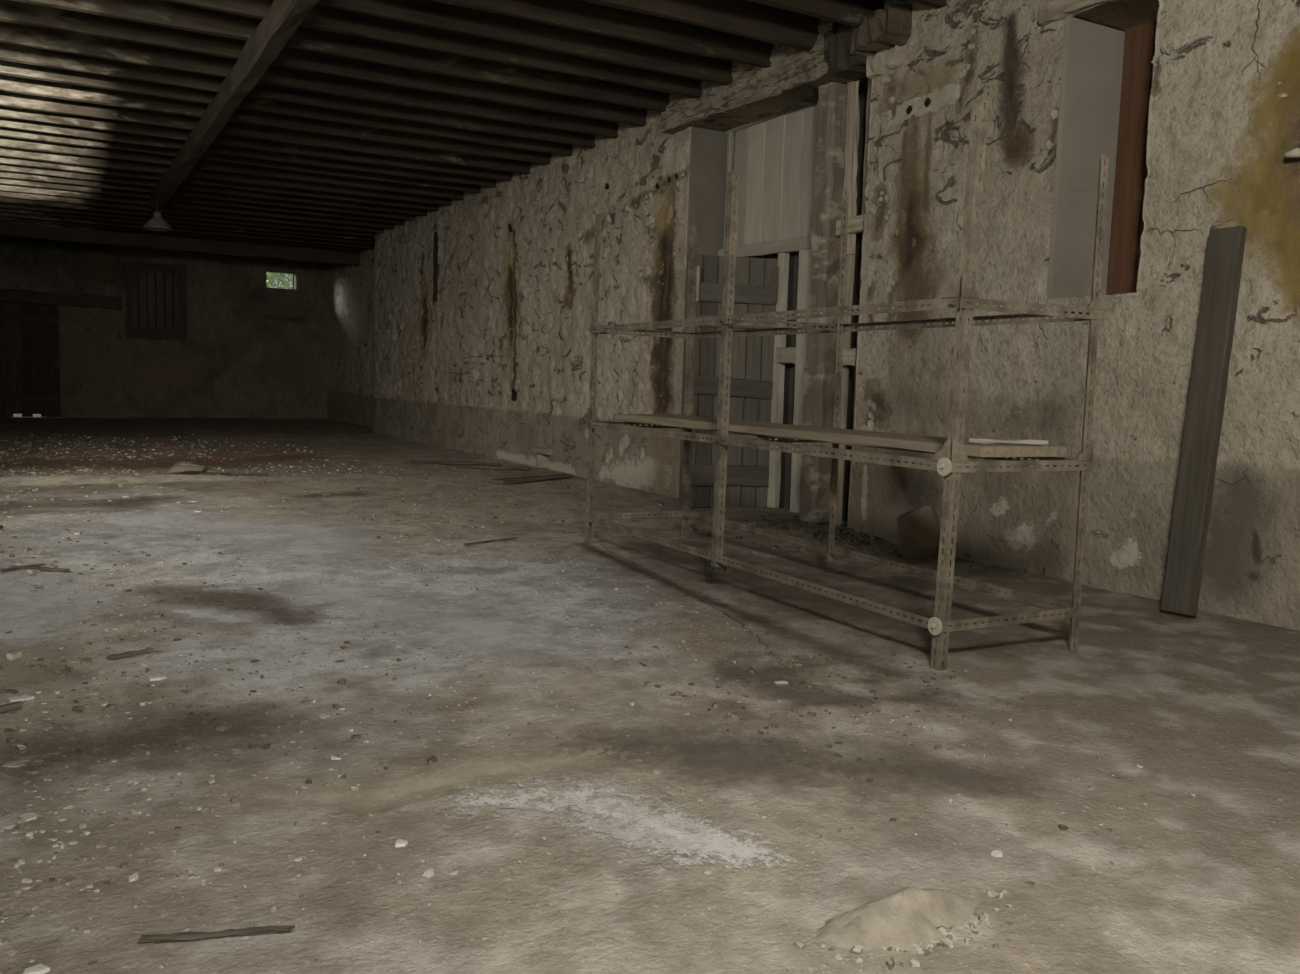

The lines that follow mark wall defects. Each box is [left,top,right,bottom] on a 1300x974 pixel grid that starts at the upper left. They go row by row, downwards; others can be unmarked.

rust [504,222,517,389]
rust [650,181,676,497]
rust [897,113,935,341]
spalling [878,28,979,131]
spalling [1046,106,1059,150]
crack [1242,0,1265,81]
damp [1211,28,1300,309]